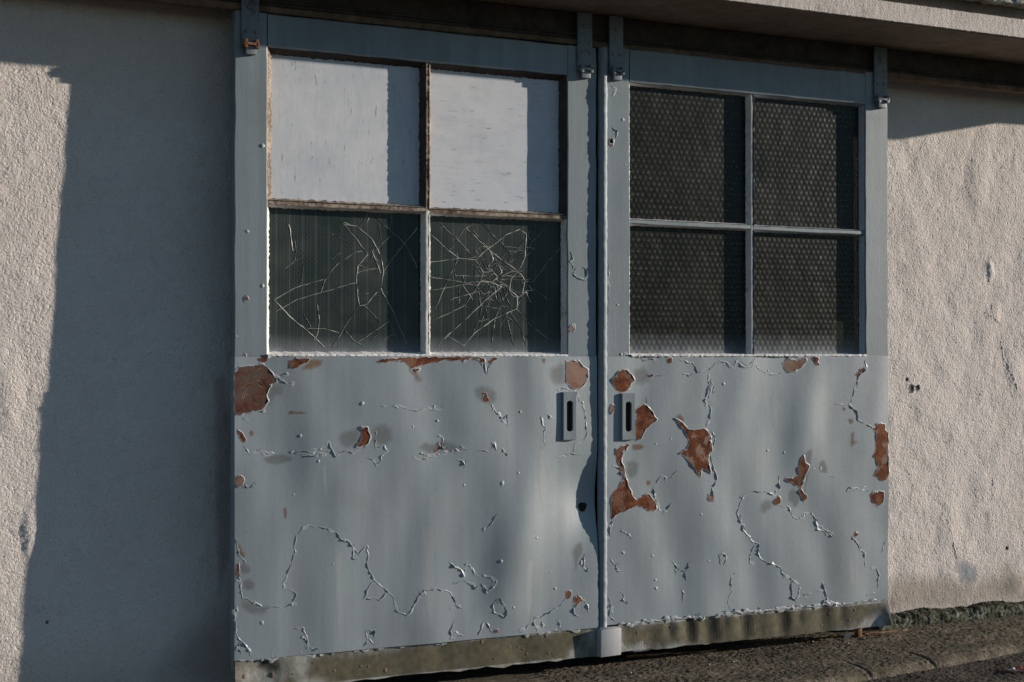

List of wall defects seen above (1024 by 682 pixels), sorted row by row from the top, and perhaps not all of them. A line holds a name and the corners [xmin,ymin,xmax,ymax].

peeling [376,355,498,373]
peeling [355,425,372,449]
peeling [565,590,583,608]